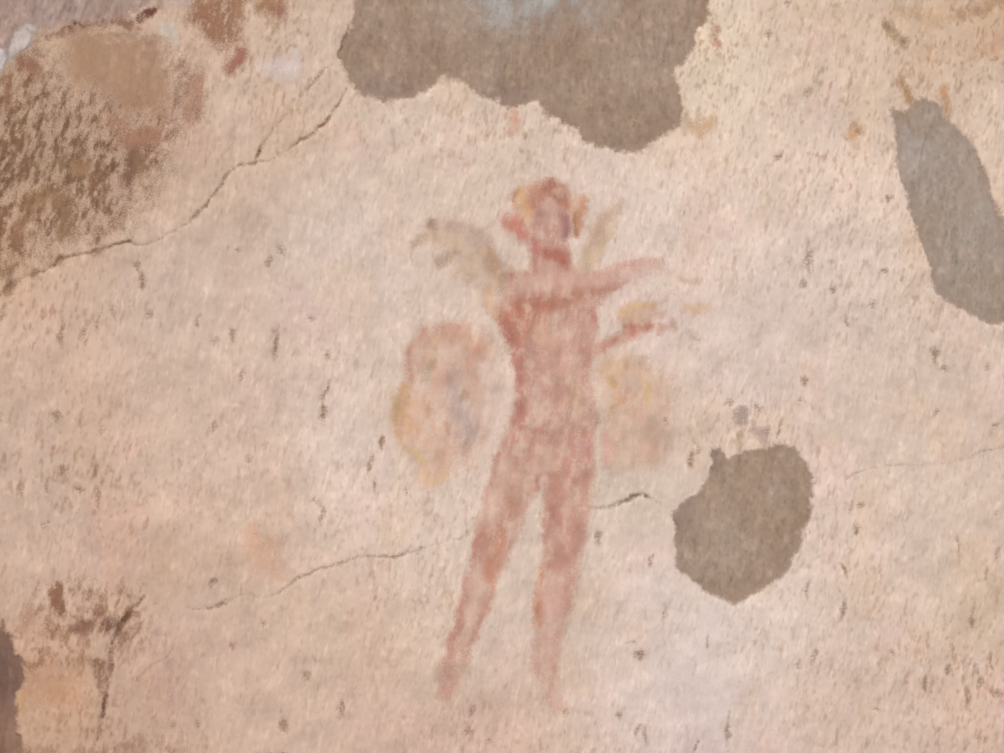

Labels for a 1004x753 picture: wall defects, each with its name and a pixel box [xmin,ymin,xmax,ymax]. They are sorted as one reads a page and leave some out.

flaking render [0,0,192,73]
damp [0,0,313,299]
crack [0,25,351,297]
crack [187,525,497,611]
crack [572,491,659,511]
flaking render [0,568,157,753]
crack [96,596,173,741]